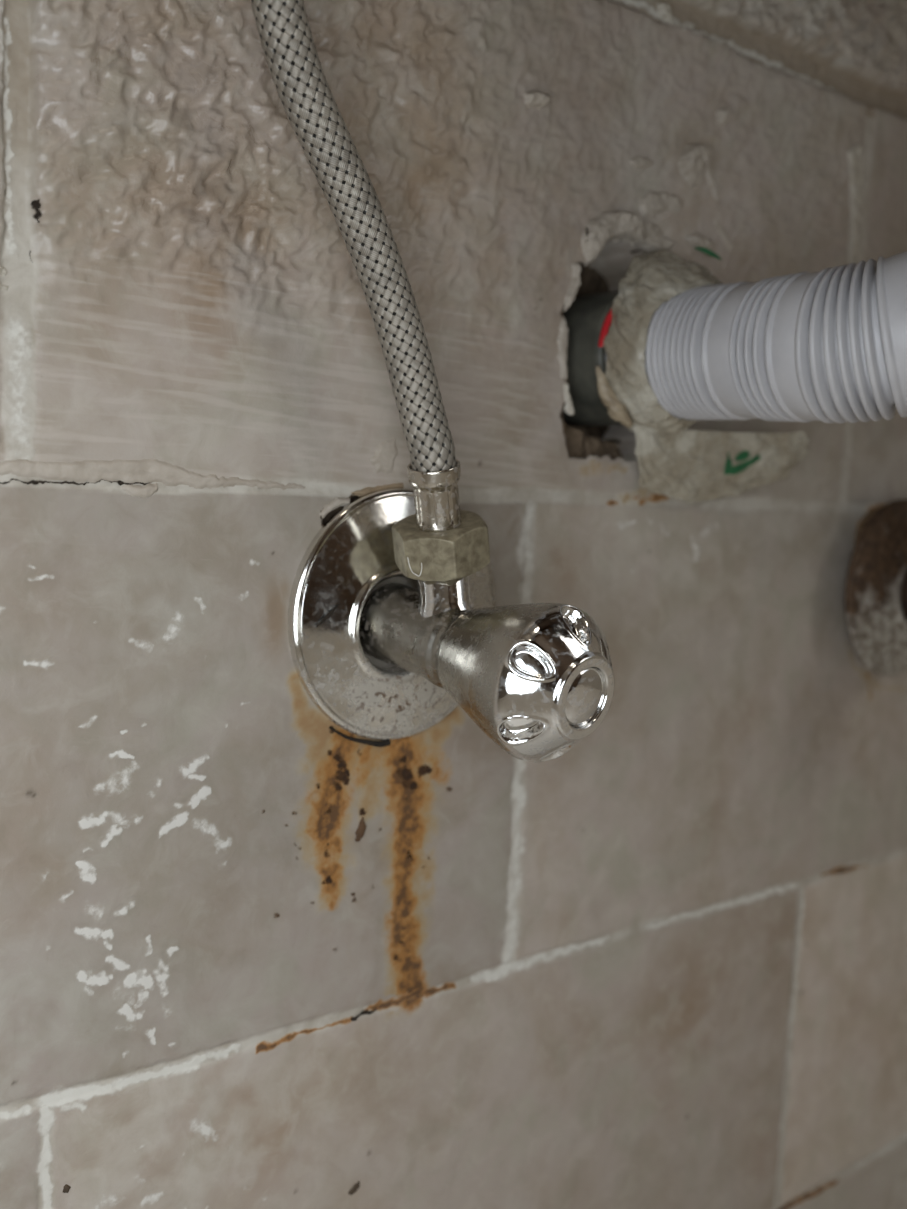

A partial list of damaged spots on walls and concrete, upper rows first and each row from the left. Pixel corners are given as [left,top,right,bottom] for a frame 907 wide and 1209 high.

spalling [557,211,715,462]
corrosion [252,661,470,1057]